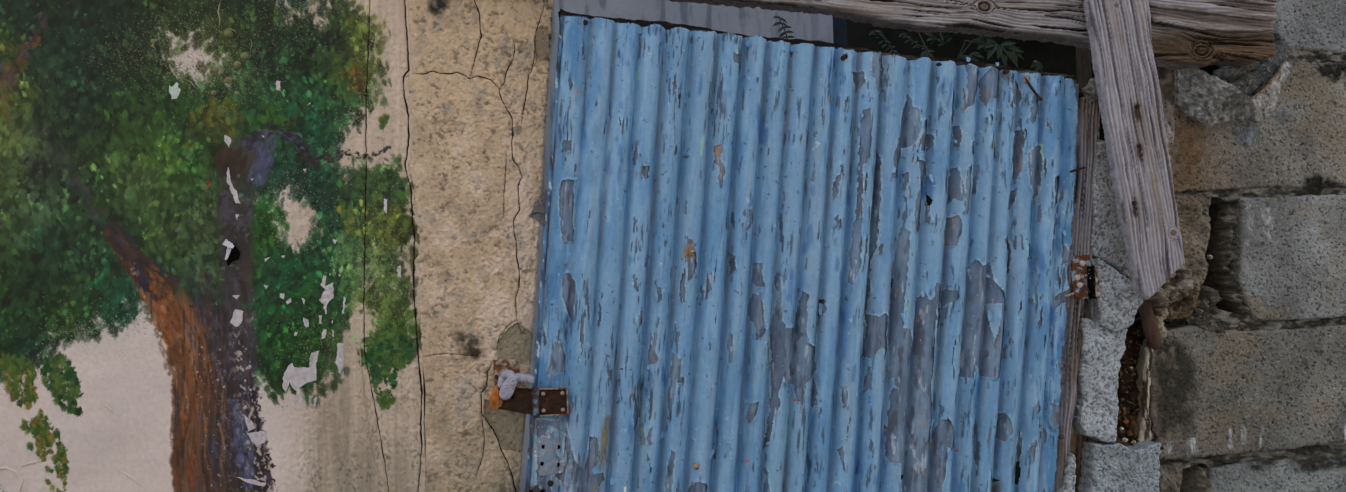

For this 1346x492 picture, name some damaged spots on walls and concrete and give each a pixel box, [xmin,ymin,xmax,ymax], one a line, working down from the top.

peeling [230,295,243,327]
peeling [264,239,356,407]
crack [363,0,544,492]
peeling [529,74,650,250]
peeling [531,217,736,492]
peeling [694,142,743,189]